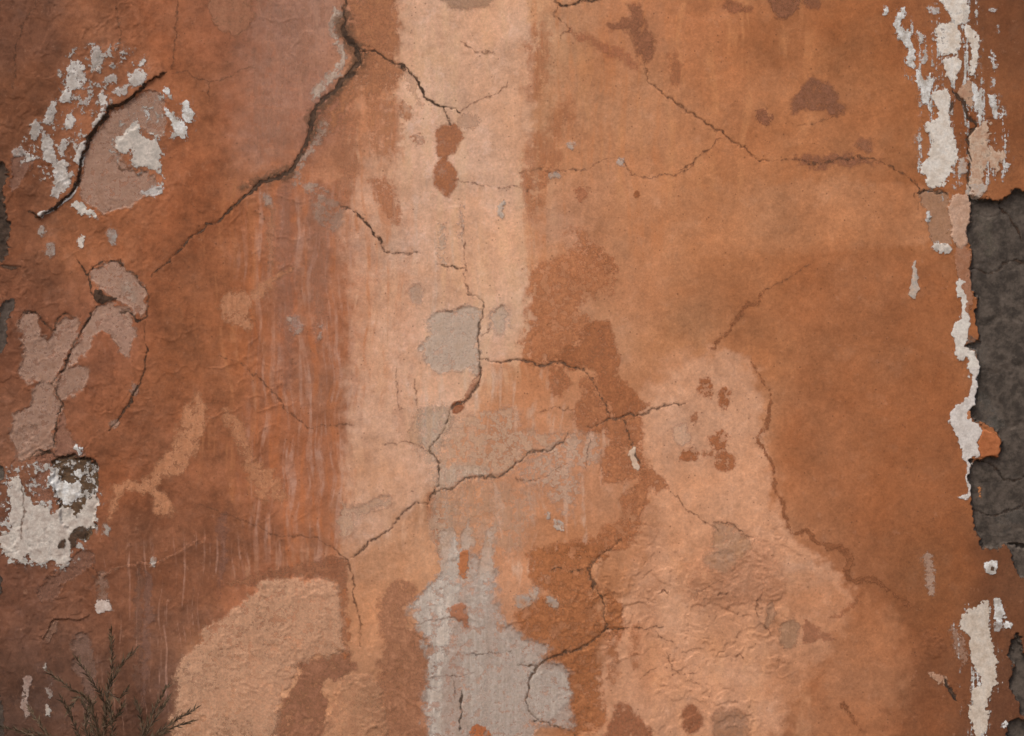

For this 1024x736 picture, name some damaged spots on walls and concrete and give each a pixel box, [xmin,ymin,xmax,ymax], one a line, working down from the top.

spalling [0,260,147,614]
peeling [0,43,195,262]
crack [19,0,507,472]
water stain [434,124,464,196]
peeling [418,304,482,375]
crack [328,246,680,625]
crack [471,539,673,731]
crack [625,77,920,196]
crack [751,361,921,610]
peeling [923,551,936,596]
spalling [882,0,1024,578]
peeling [949,598,1024,736]